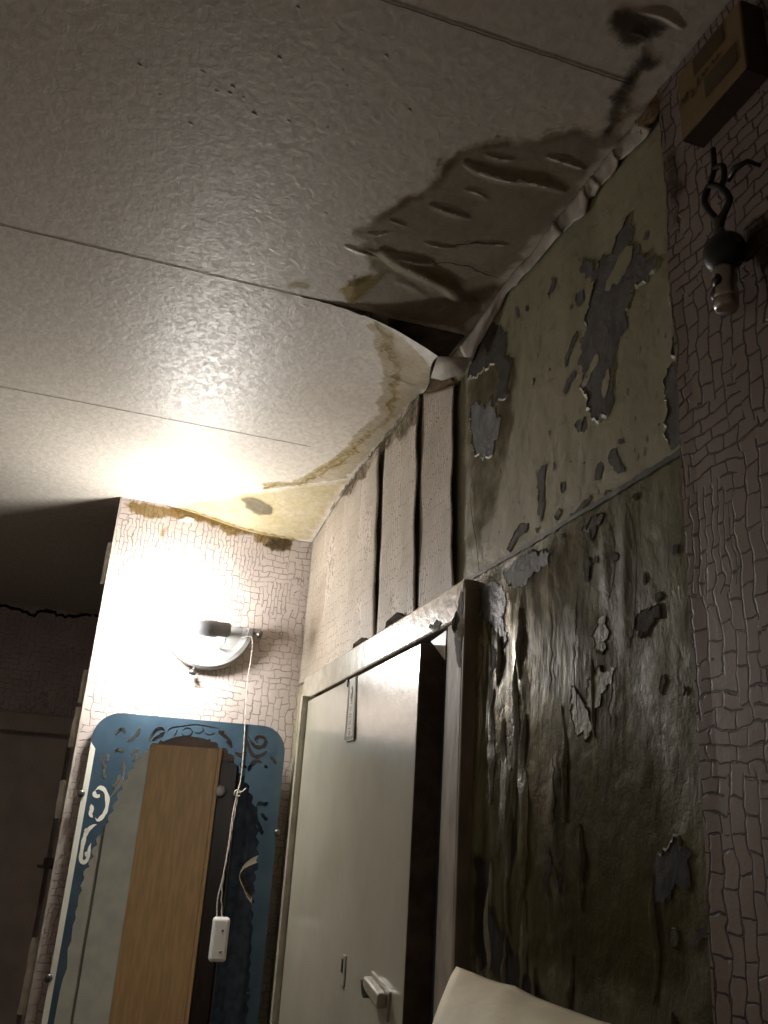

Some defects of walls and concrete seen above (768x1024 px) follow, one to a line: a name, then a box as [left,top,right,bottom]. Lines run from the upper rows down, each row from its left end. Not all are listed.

peeling [467,320,513,461]
peeling [563,212,663,433]
peeling [662,331,680,451]
peeling [581,439,625,496]
peeling [634,592,664,639]
peeling [477,462,605,997]
peeling [561,616,615,823]
leakage [474,859,537,994]
spalling [648,834,691,1006]